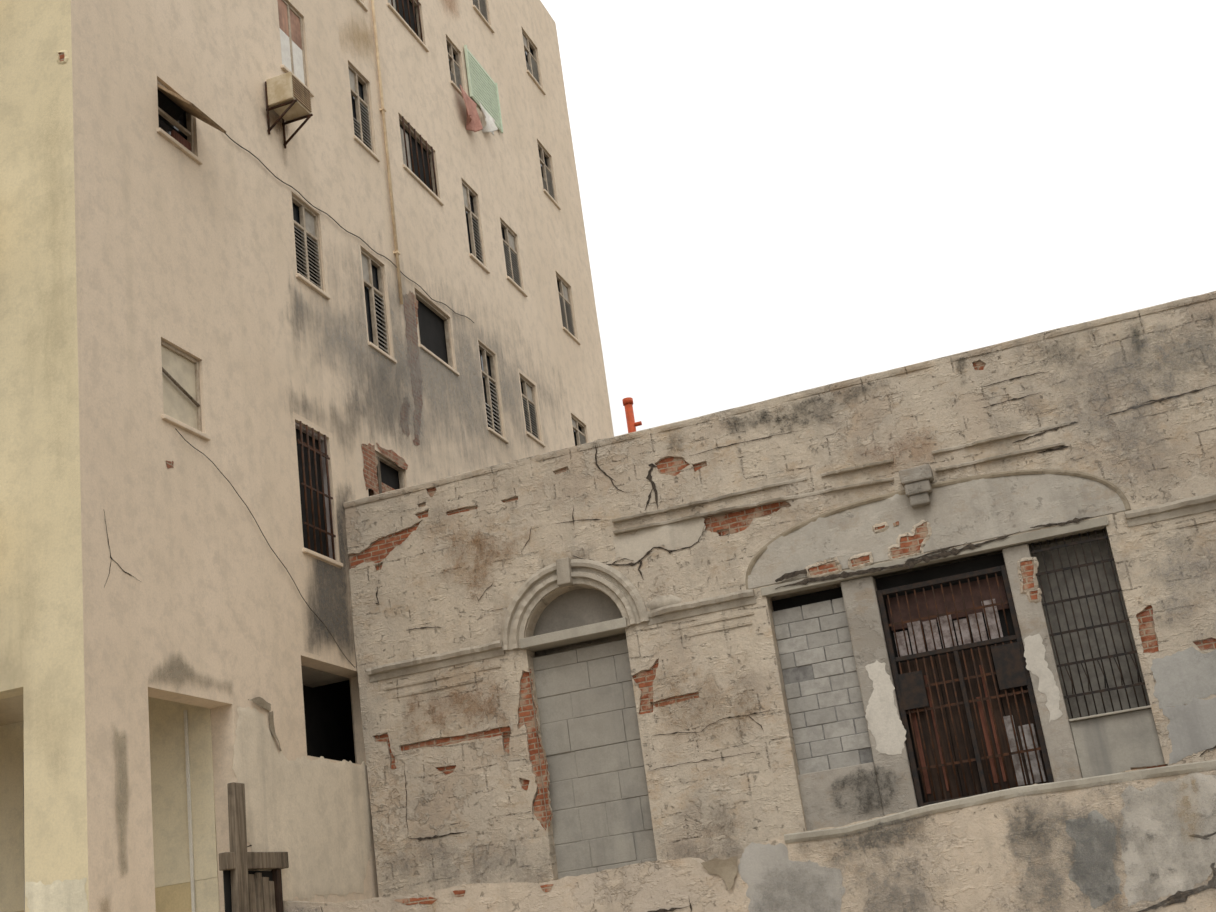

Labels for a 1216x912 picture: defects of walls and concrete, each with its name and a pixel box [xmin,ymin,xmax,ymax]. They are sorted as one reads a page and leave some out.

crack [1013,385,1215,453]
crack [594,440,658,510]
crack [104,512,134,587]
flaking render [348,487,437,571]
crack [572,525,705,580]
flaking render [612,501,791,563]
flaking render [804,520,932,578]
flaking render [1136,606,1159,653]
flaking render [633,661,699,714]
flaking render [374,669,553,831]
crack [648,900,692,912]
crack [1137,832,1216,912]